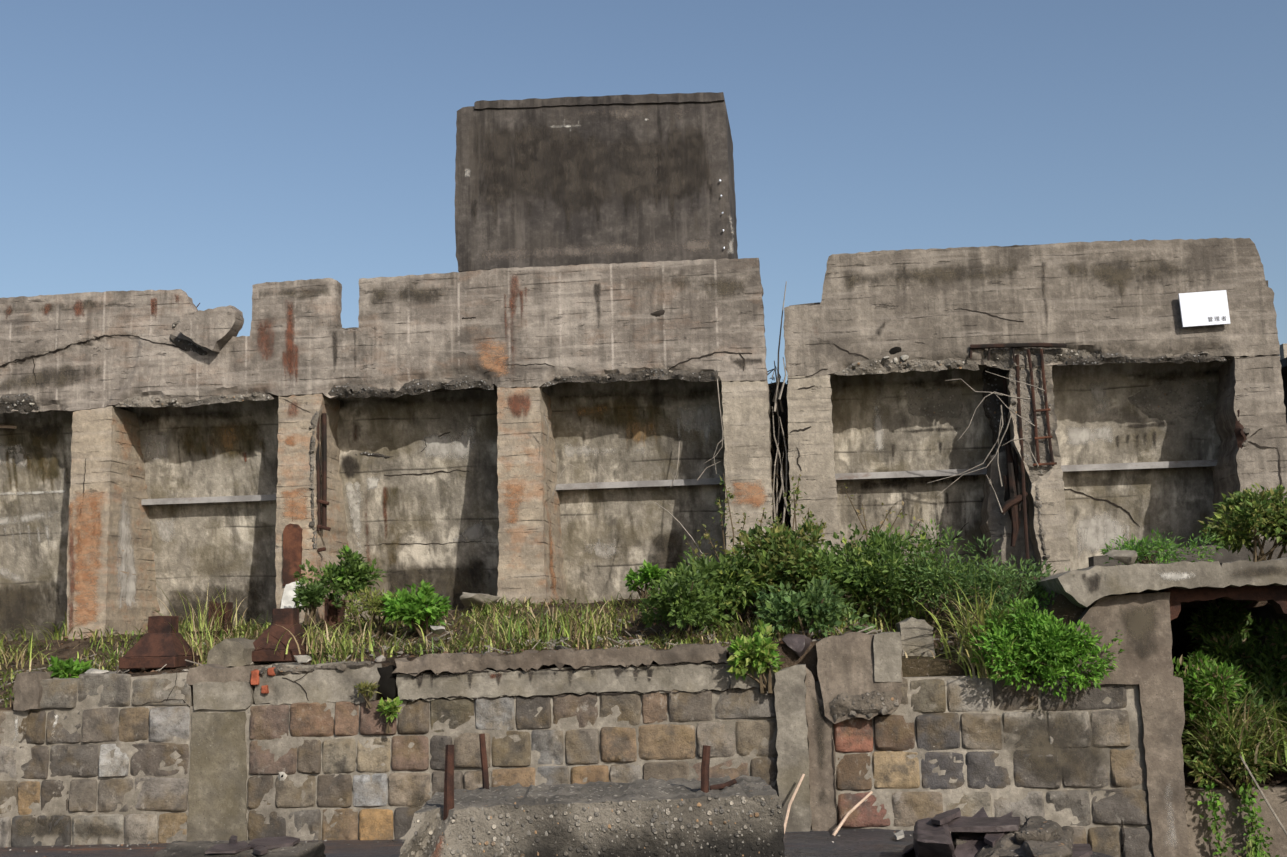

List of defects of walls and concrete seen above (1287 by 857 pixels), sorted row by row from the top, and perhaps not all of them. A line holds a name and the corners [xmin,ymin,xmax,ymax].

corrosion [505,276,527,327]
crack [0,335,186,386]
corrosion [258,306,298,373]
spalling [542,368,721,387]
crack [667,351,752,371]
spalling [0,393,40,414]
spalling [833,343,1226,575]
crack [1247,428,1282,486]
crack [1064,489,1140,527]